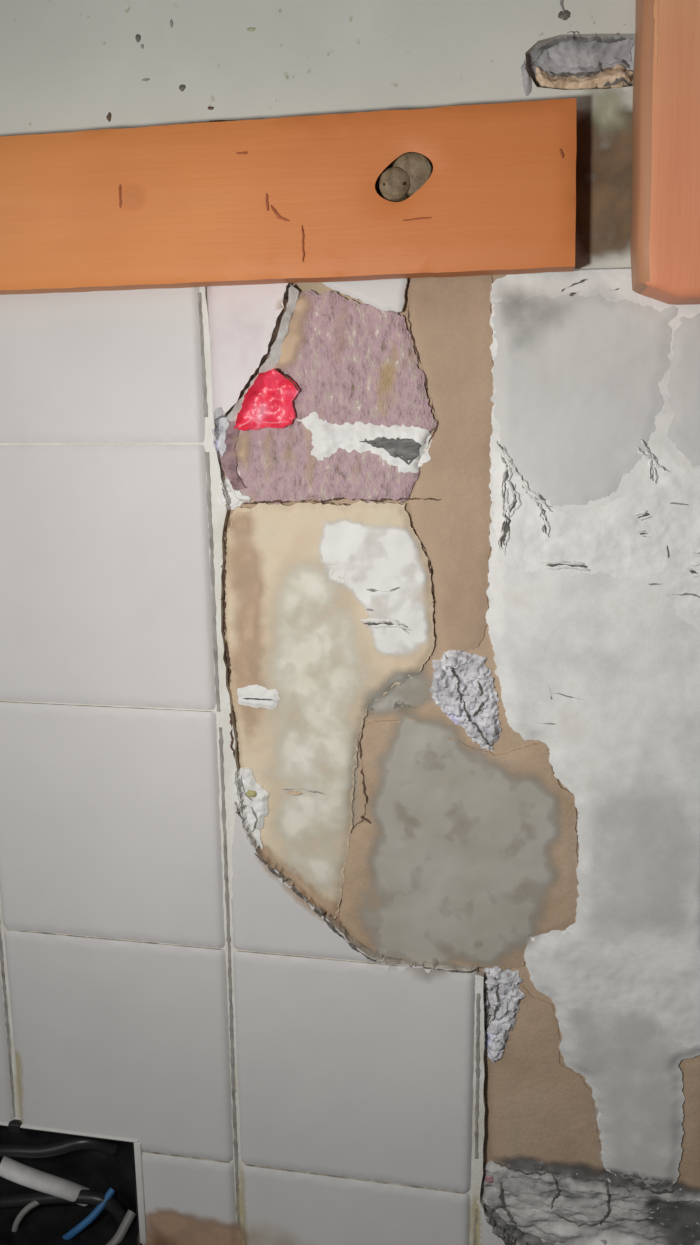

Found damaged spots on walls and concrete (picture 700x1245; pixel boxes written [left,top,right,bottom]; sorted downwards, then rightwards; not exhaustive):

spalling [521,31,635,96]
peeling [226,284,301,431]
crack [242,498,441,642]
crack [496,441,590,571]
crack [635,439,700,598]
crack [220,530,483,973]
flaking render [321,269,700,1245]